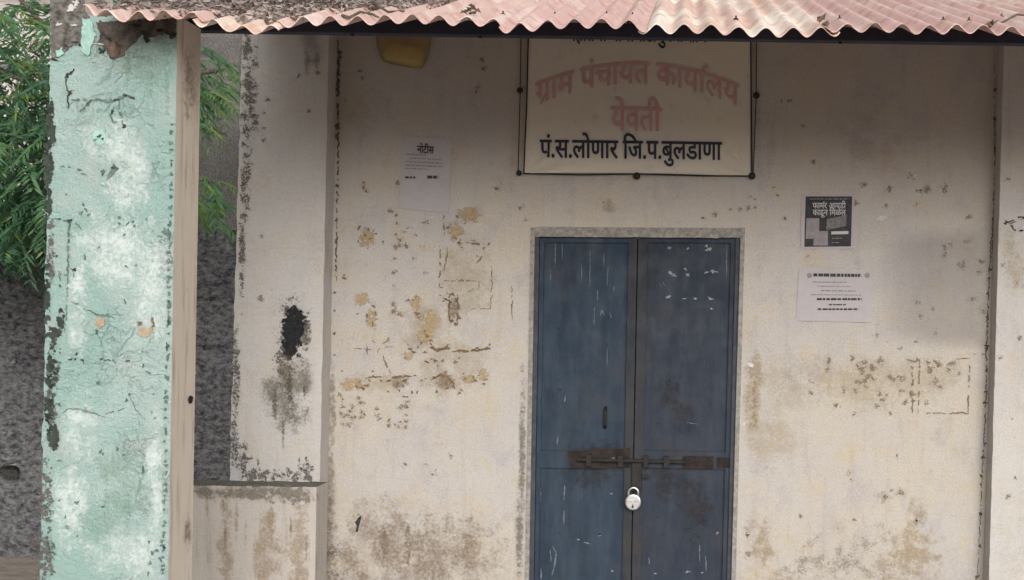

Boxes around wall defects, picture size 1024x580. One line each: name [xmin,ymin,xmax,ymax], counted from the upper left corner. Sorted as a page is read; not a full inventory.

flaking render [49,0,177,61]
peeling [357,208,479,287]
crack [61,402,145,420]
damp [196,328,319,504]
damp [265,297,312,438]
peeling [338,293,489,429]
peeling [835,356,909,408]